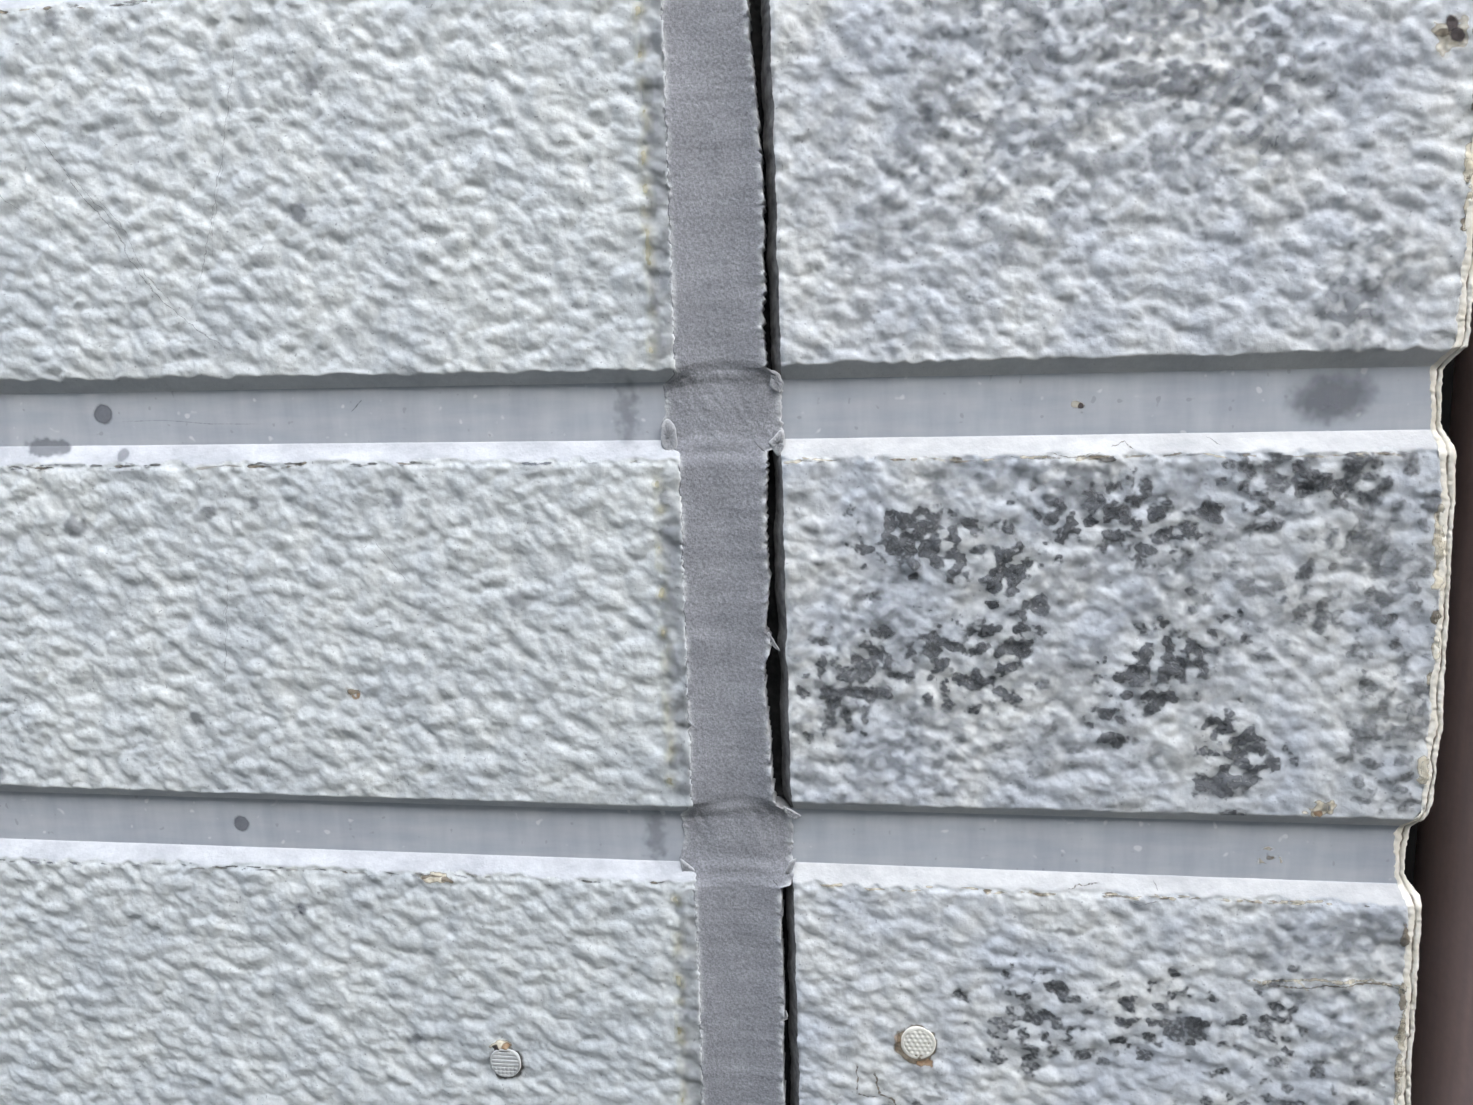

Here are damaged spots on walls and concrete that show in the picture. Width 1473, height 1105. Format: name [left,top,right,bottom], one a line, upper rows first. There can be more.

crack [747,0,772,368]
water stain [796,452,1440,815]
water stain [975,955,1308,1105]
water stain [1310,1061,1368,1105]